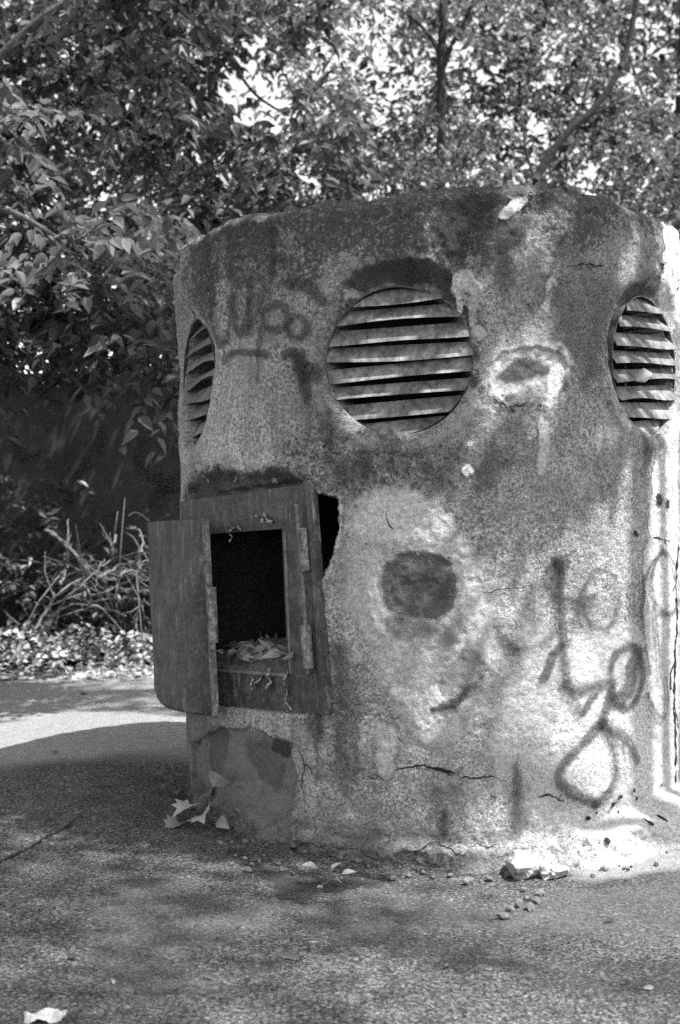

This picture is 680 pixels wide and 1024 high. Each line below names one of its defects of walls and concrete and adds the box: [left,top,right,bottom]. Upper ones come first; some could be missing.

spalling [499,194,533,221]
leakage [383,551,457,620]
crack [298,751,313,803]
crack [368,764,504,781]